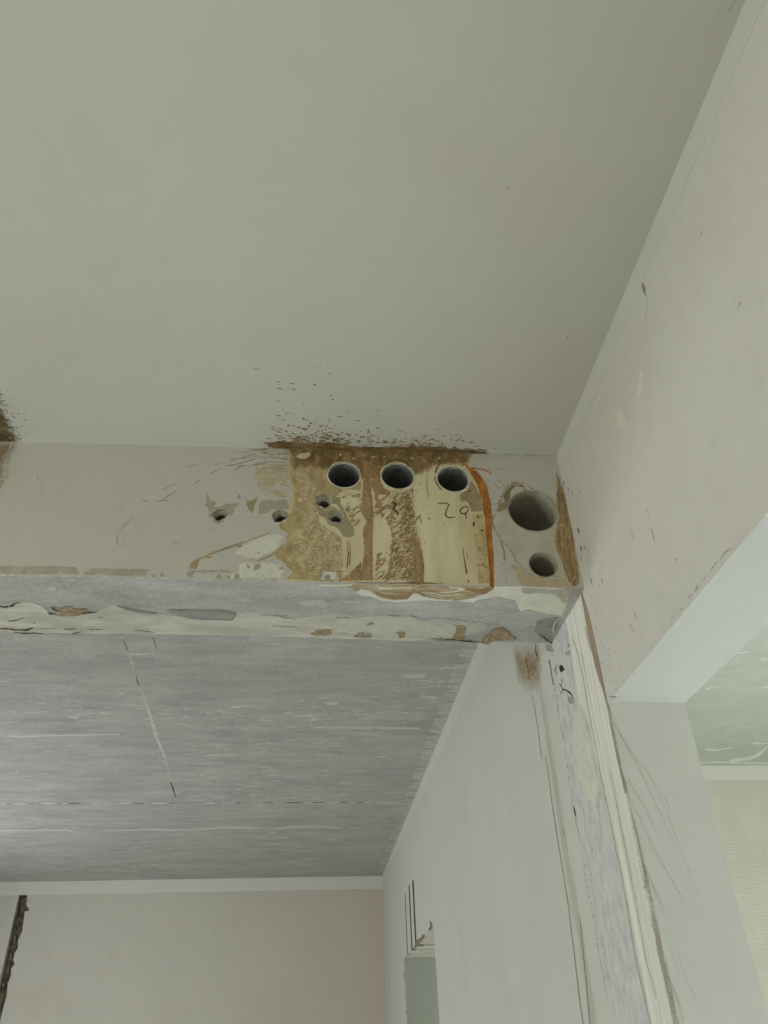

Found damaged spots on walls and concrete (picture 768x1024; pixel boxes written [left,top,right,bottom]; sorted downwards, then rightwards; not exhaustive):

peeling [205,482,291,532]
peeling [316,462,361,537]
rust [235,409,525,587]
spalling [434,466,469,492]
crack [0,602,103,634]
flaking render [0,602,517,645]
spalling [534,616,561,643]
crack [2,630,178,804]
crack [266,798,396,806]